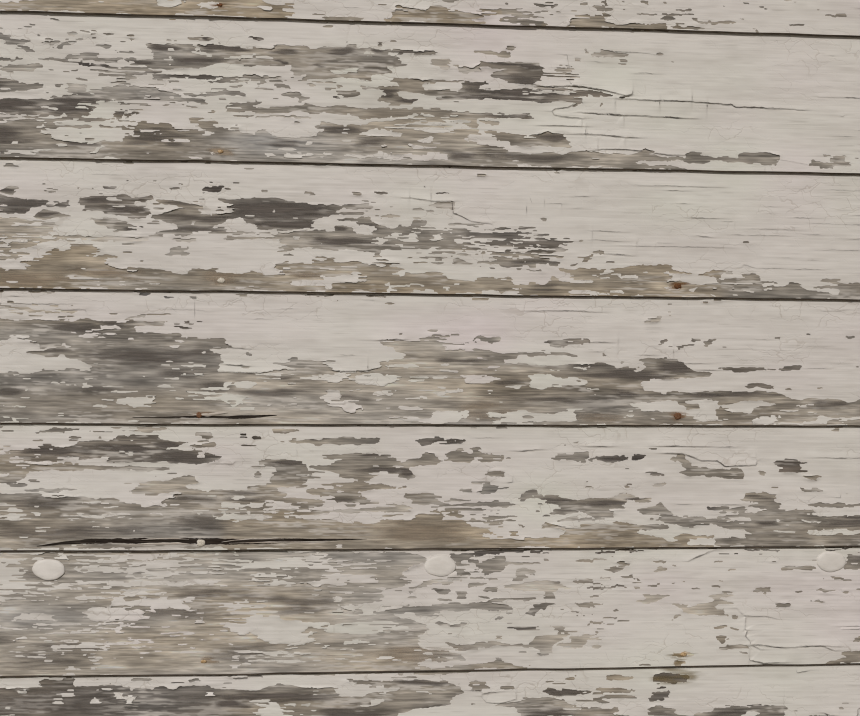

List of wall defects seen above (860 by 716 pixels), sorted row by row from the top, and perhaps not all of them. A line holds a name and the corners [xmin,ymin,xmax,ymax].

peeling [0,0,295,20]
peeling [378,0,560,26]
peeling [567,0,744,32]
peeling [0,24,780,177]
peeling [0,182,860,716]